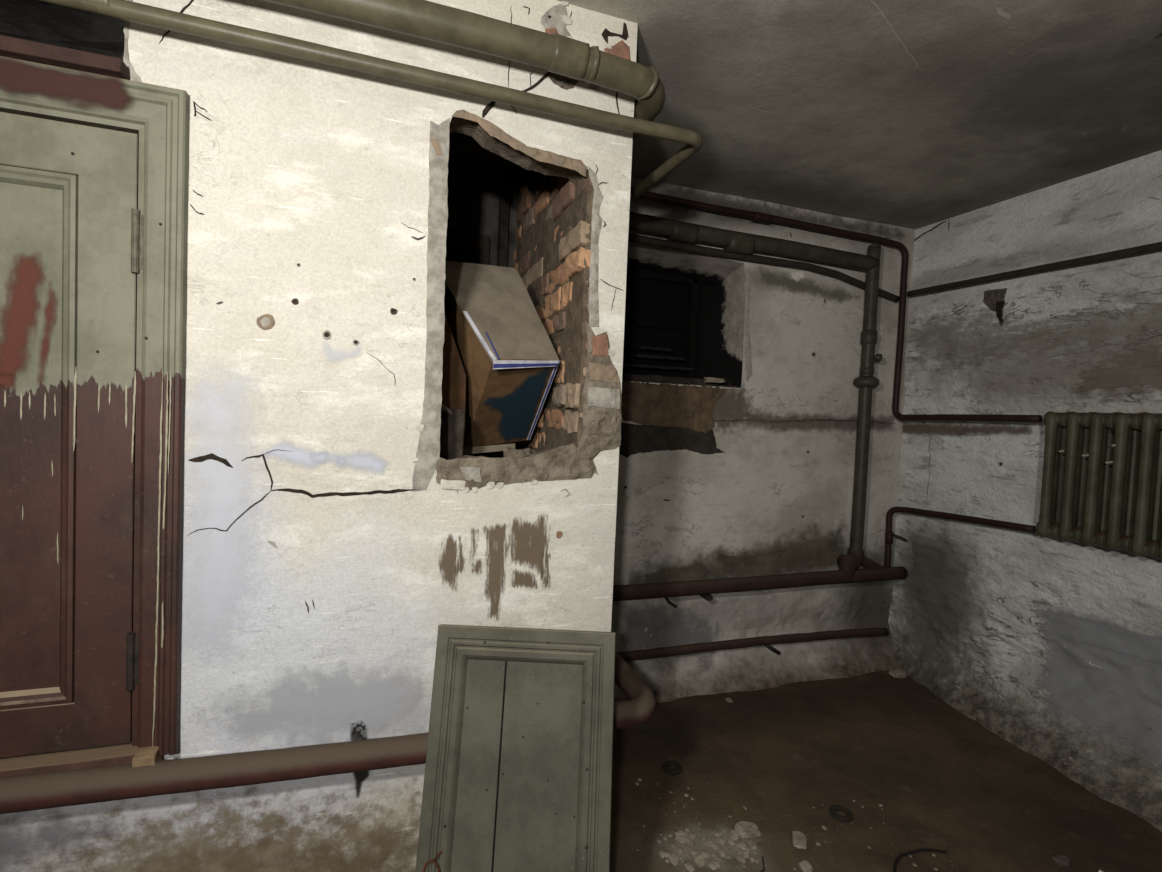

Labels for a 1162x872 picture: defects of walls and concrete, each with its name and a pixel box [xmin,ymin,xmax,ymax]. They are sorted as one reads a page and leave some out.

crack [159,0,193,43]
spalling [412,109,726,493]
crack [187,449,416,536]
leakage [629,525,843,585]
leakage [625,609,712,658]
leakage [903,535,974,678]
leakage [0,819,84,867]
leakage [81,791,420,872]